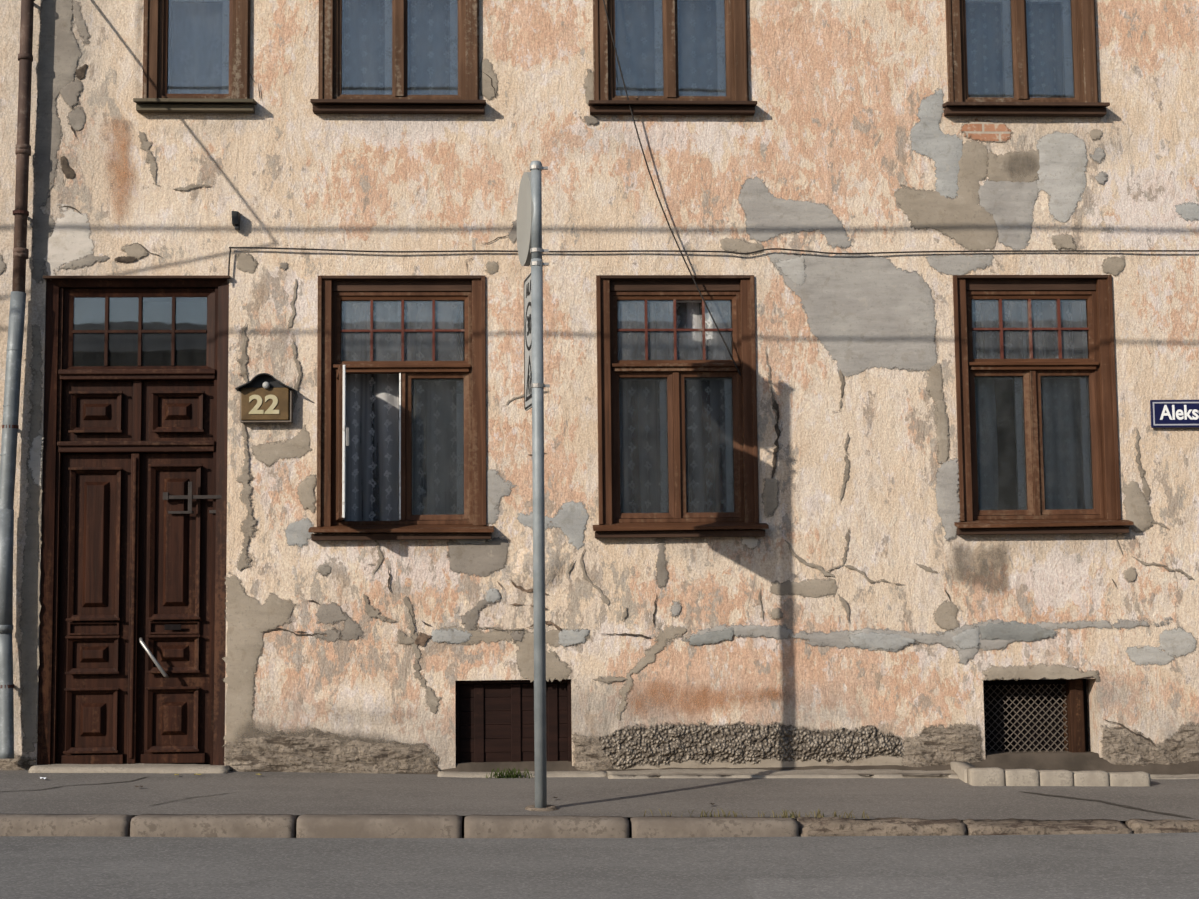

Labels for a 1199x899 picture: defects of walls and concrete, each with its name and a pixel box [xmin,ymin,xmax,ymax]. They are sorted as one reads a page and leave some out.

spalling [31,0,161,284]
spalling [961,119,1013,143]
spalling [222,572,439,774]
crack [363,540,441,713]
spalling [572,721,983,771]
crack [459,349,1172,720]
spalling [933,588,959,631]
spalling [1101,718,1199,766]
crack [1112,428,1194,586]